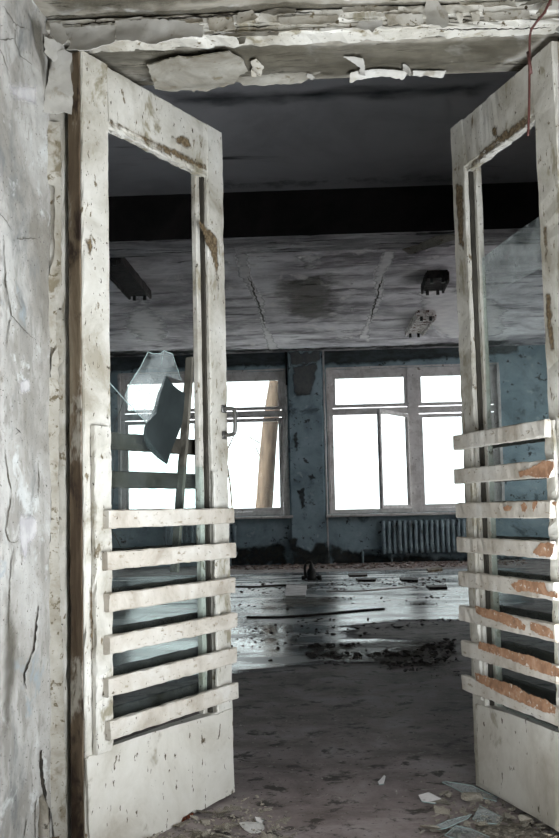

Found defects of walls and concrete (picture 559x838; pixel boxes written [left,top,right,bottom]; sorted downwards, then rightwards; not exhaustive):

peeling [43,0,552,115]
crack [248,278,265,325]
damp [280,276,334,318]
crack [370,277,383,321]
flaking render [289,350,320,396]
crack [24,606,39,689]